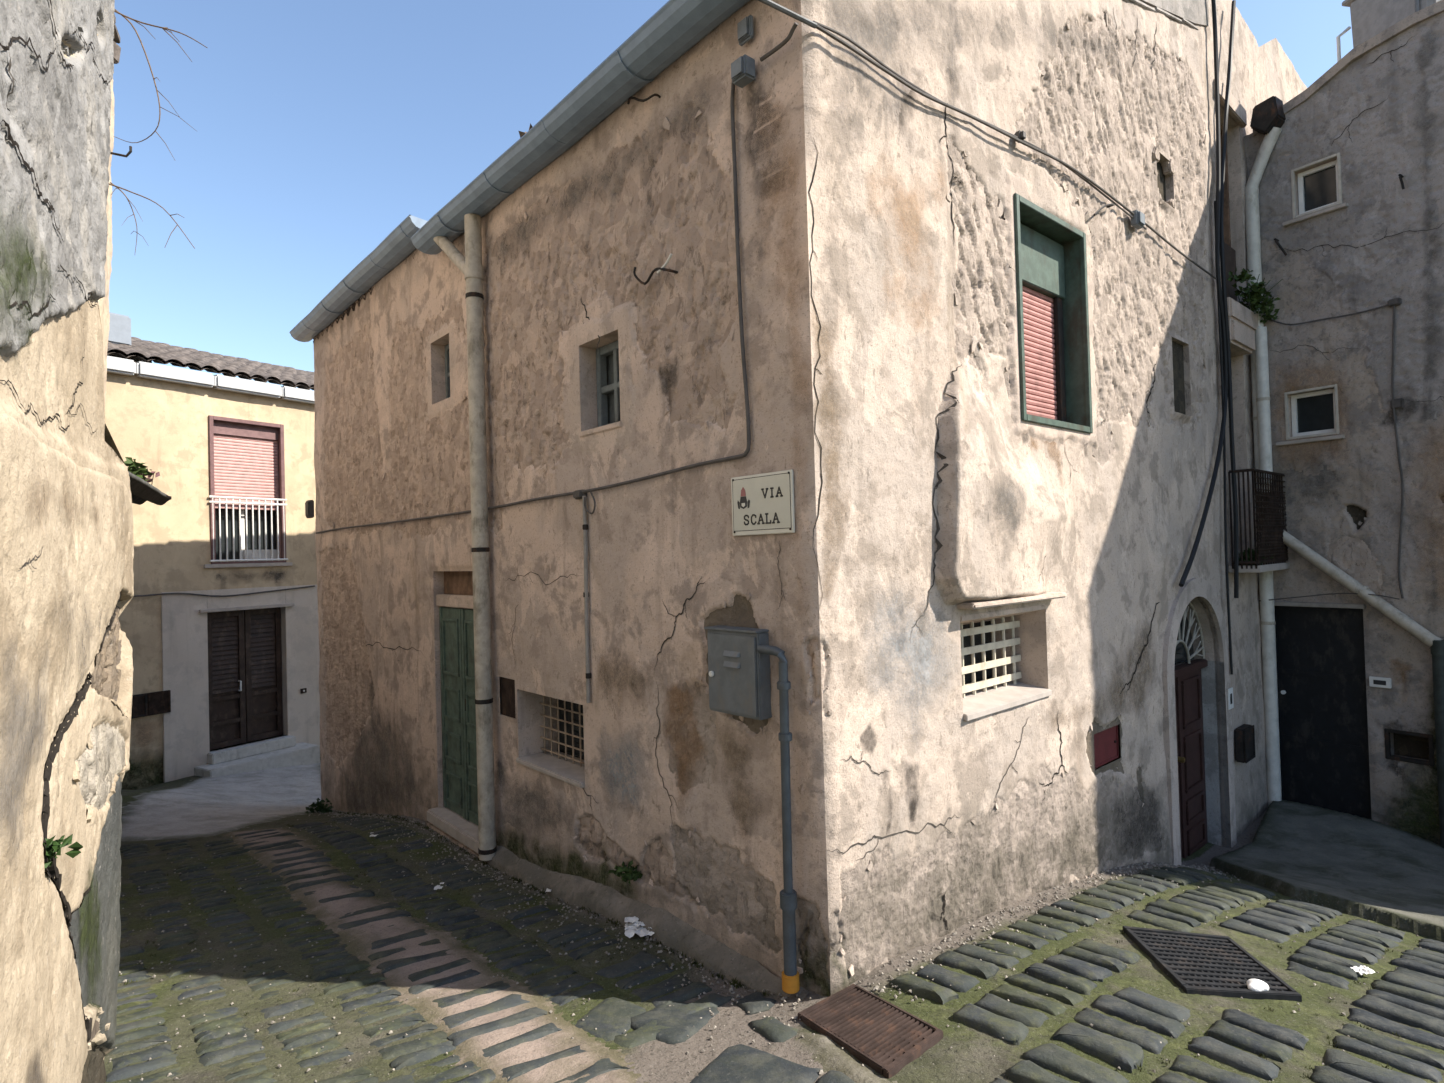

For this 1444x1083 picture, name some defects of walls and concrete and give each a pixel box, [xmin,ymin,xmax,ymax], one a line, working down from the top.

crack [0,0,110,433]
peeling [323,102,738,541]
crack [777,137,823,626]
crack [940,103,961,241]
crack [41,592,130,1048]
spalling [73,721,126,823]
spalling [87,600,123,702]
crack [654,577,705,831]
peeling [666,593,768,795]
peeling [573,714,1169,989]
crack [828,711,1067,861]
peeling [1326,505,1386,597]